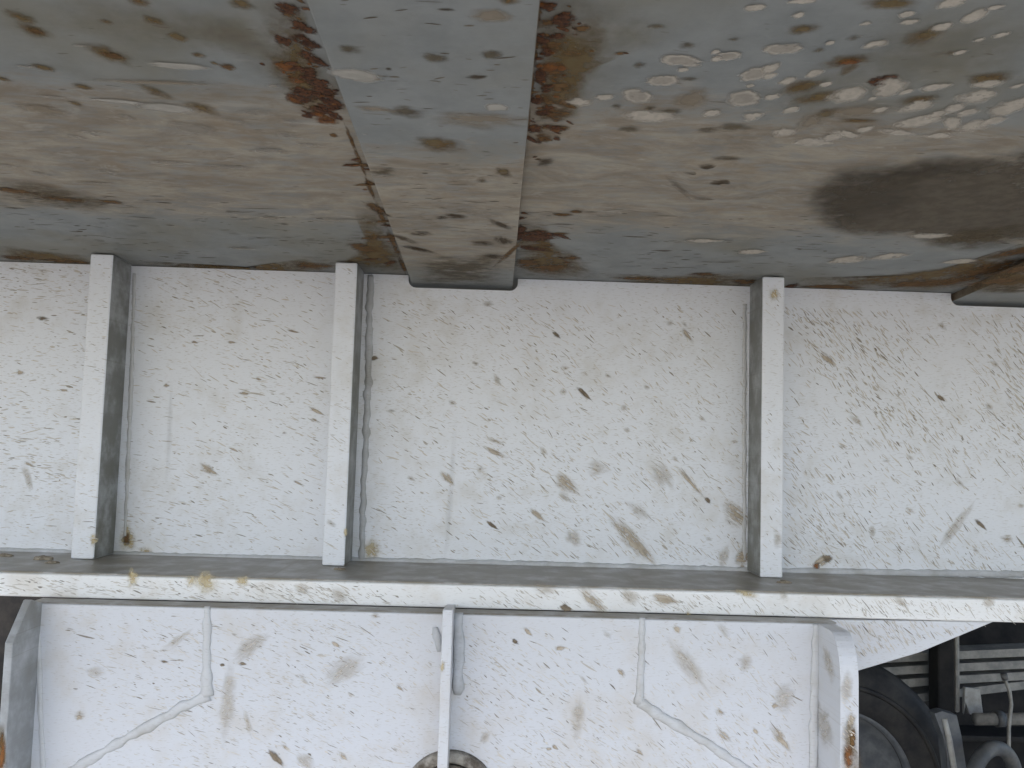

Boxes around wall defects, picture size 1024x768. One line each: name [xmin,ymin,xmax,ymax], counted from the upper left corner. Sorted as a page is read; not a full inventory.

rust [260,0,425,271]
rust [527,2,600,144]
rust [429,212,580,280]
leakage [817,156,1024,264]